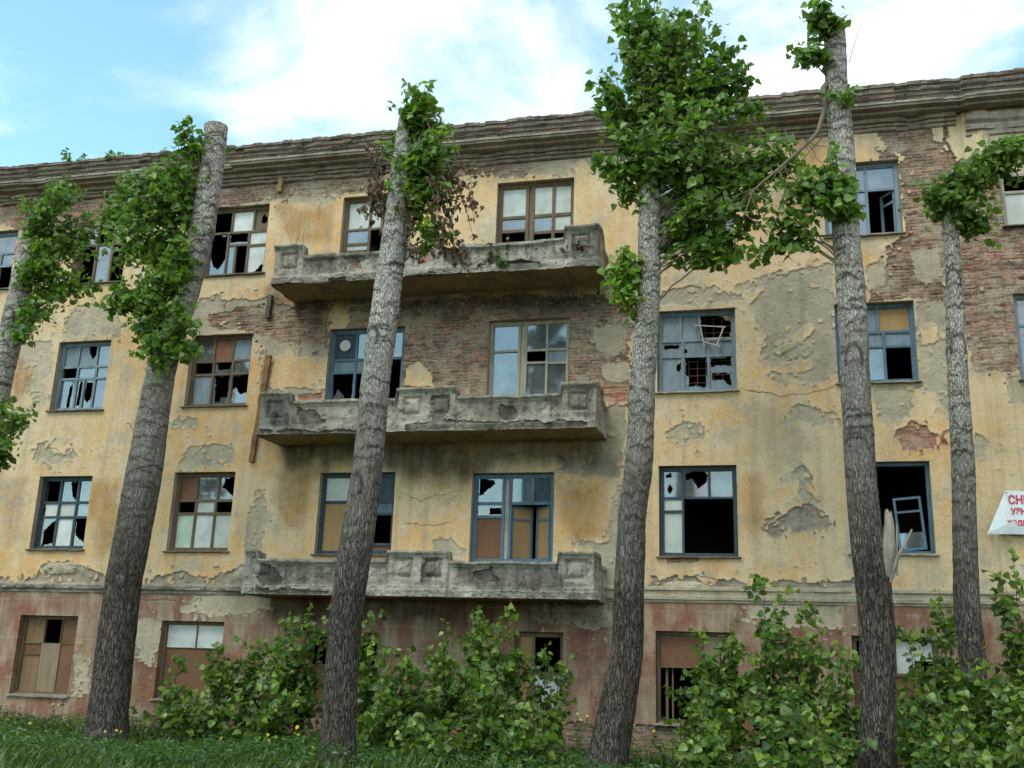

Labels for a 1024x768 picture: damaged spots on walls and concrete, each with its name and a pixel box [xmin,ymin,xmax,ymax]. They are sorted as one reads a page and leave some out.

flaking render [865,127,1024,461]
flaking render [192,288,371,435]
flaking render [660,258,842,438]
flaking render [30,435,82,474]
flaking render [169,415,244,472]
flaking render [397,286,634,642]
flaking render [661,410,710,454]
flaking render [750,464,836,549]
flaking render [0,554,105,584]